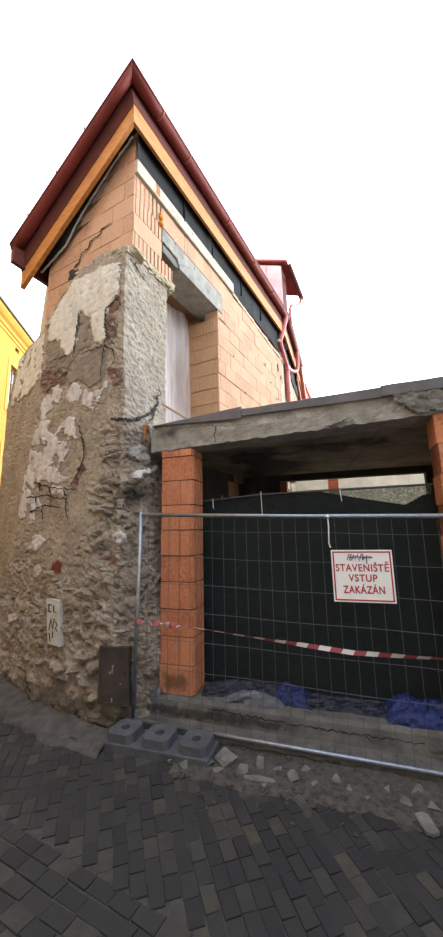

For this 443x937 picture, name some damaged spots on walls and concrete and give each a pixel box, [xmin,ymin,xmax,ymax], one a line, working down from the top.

crack [74,223,111,268]
flaking render [11,262,125,524]
crack [110,393,162,424]
spalling [393,388,443,412]
crack [26,416,85,520]
spalling [121,481,148,500]
flaking render [28,535,46,551]
flaking render [111,530,128,546]